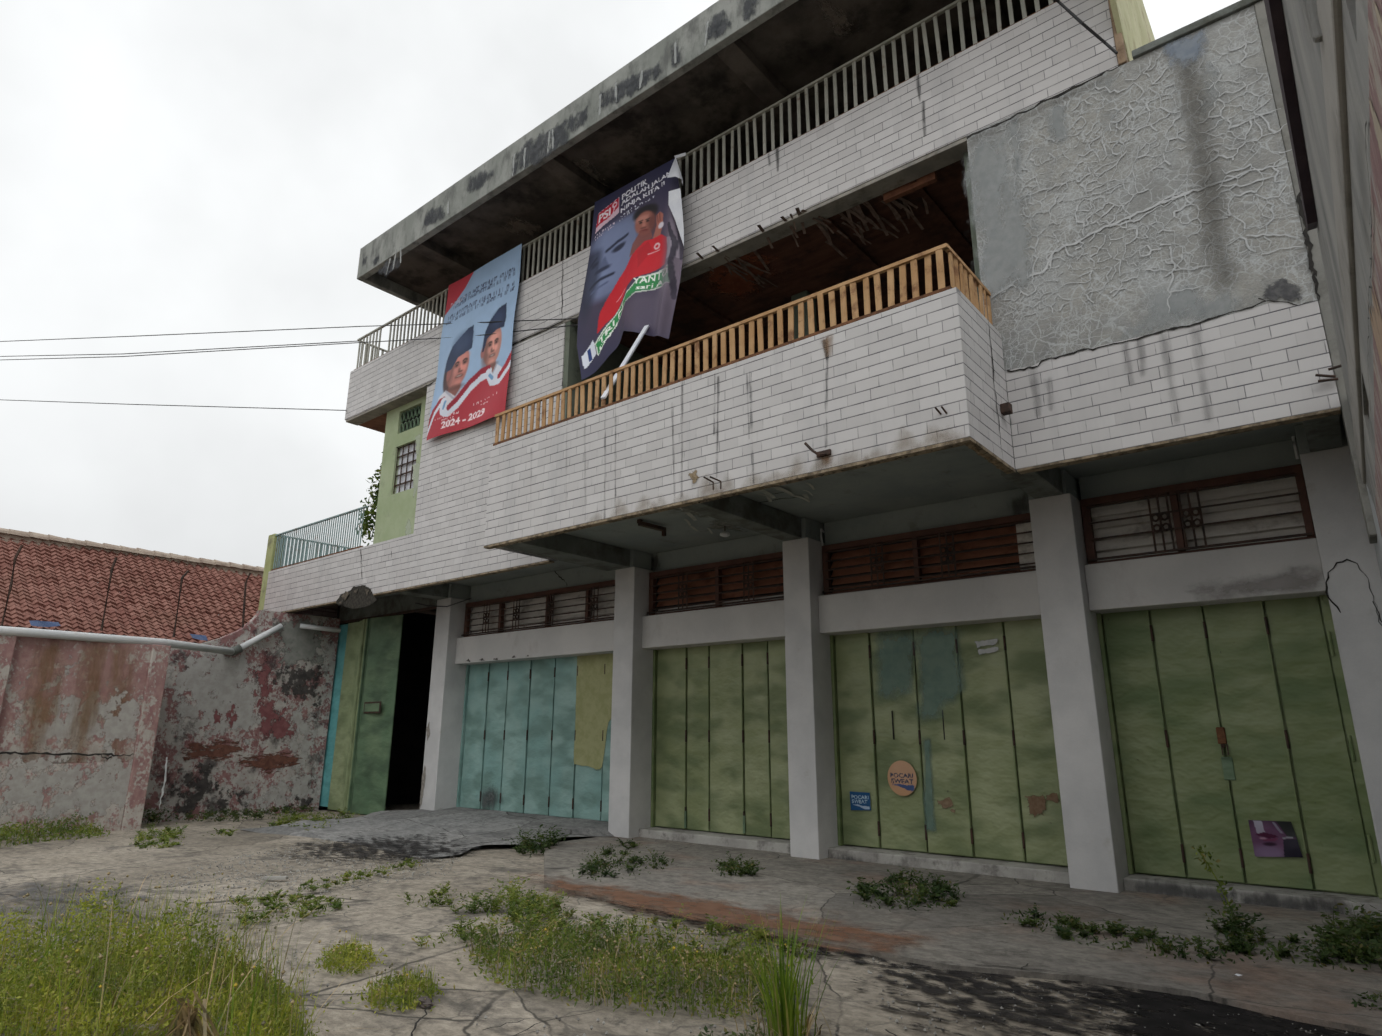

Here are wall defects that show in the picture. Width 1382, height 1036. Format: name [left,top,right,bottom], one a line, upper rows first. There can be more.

water stain [704,0,758,45]
water stain [1165,31,1210,72]
water stain [512,42,680,176]
water stain [468,171,493,191]
water stain [424,201,449,225]
crack [966,32,1320,450]
crack [1325,559,1382,626]
crack [0,751,132,760]
peeling [0,655,143,829]
peeling [164,618,327,814]
crack [159,757,168,809]
crack [411,1006,431,1036]